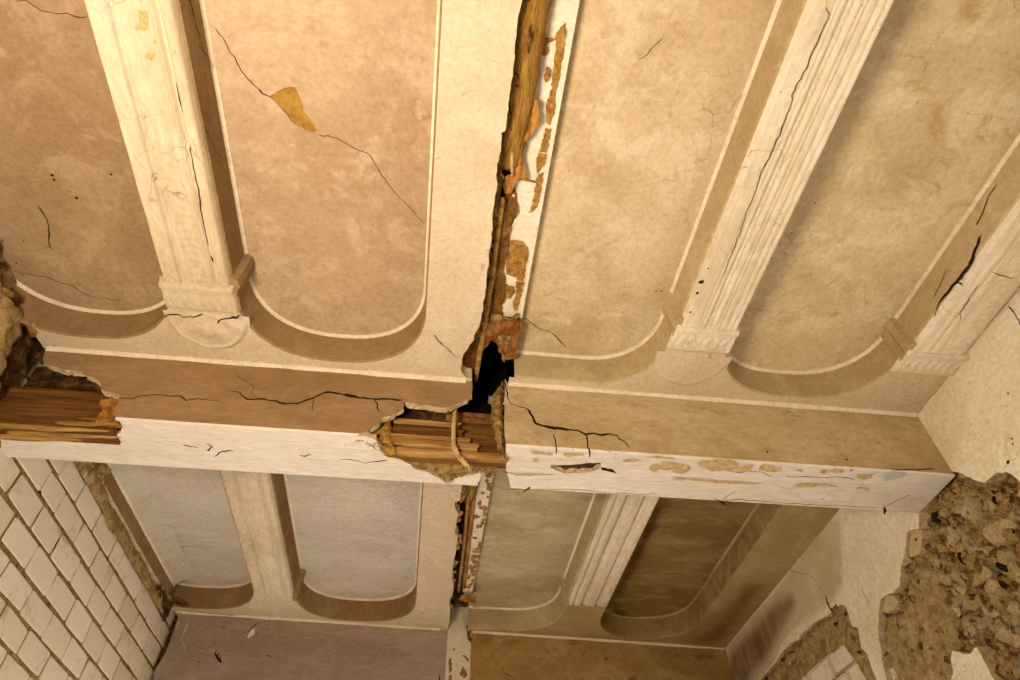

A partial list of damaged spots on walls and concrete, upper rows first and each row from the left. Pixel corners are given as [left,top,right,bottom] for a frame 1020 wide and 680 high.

crack [189,0,269,97]
spalling [270,87,320,135]
peeling [474,0,580,340]
crack [723,8,830,275]
crack [933,186,1013,318]
spalling [0,292,122,434]
crack [119,372,402,412]
spalling [354,351,616,621]
crack [502,383,654,495]
peeling [623,456,782,485]
crack [716,470,908,515]
spalling [761,469,1020,680]